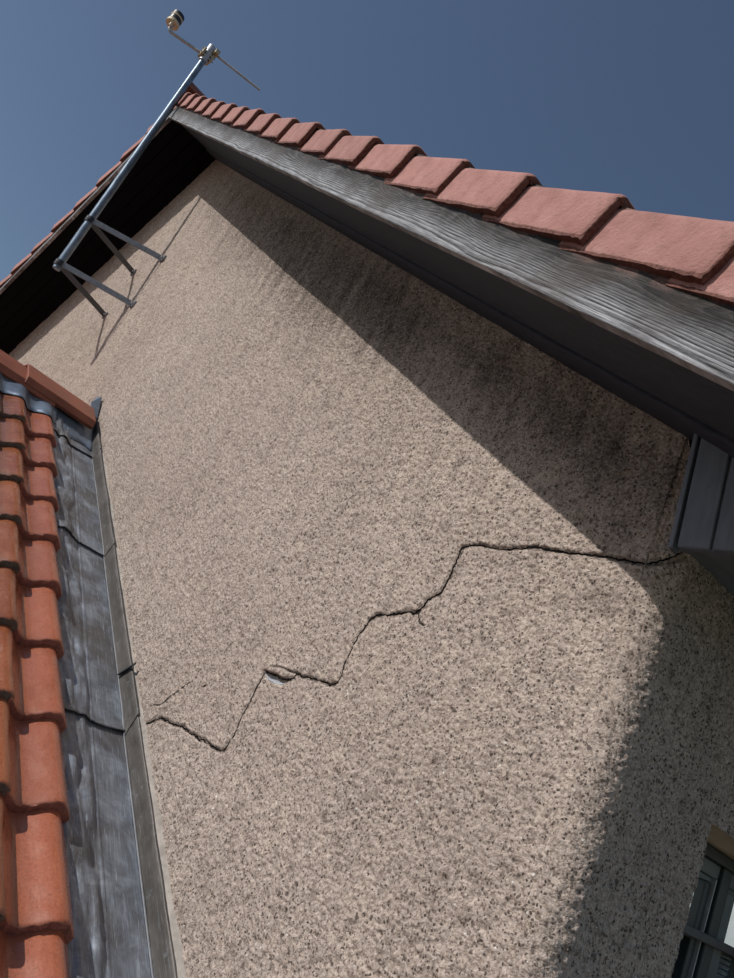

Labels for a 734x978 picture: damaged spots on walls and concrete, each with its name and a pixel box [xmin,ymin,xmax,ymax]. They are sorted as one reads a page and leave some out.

crack [146,544,683,752]